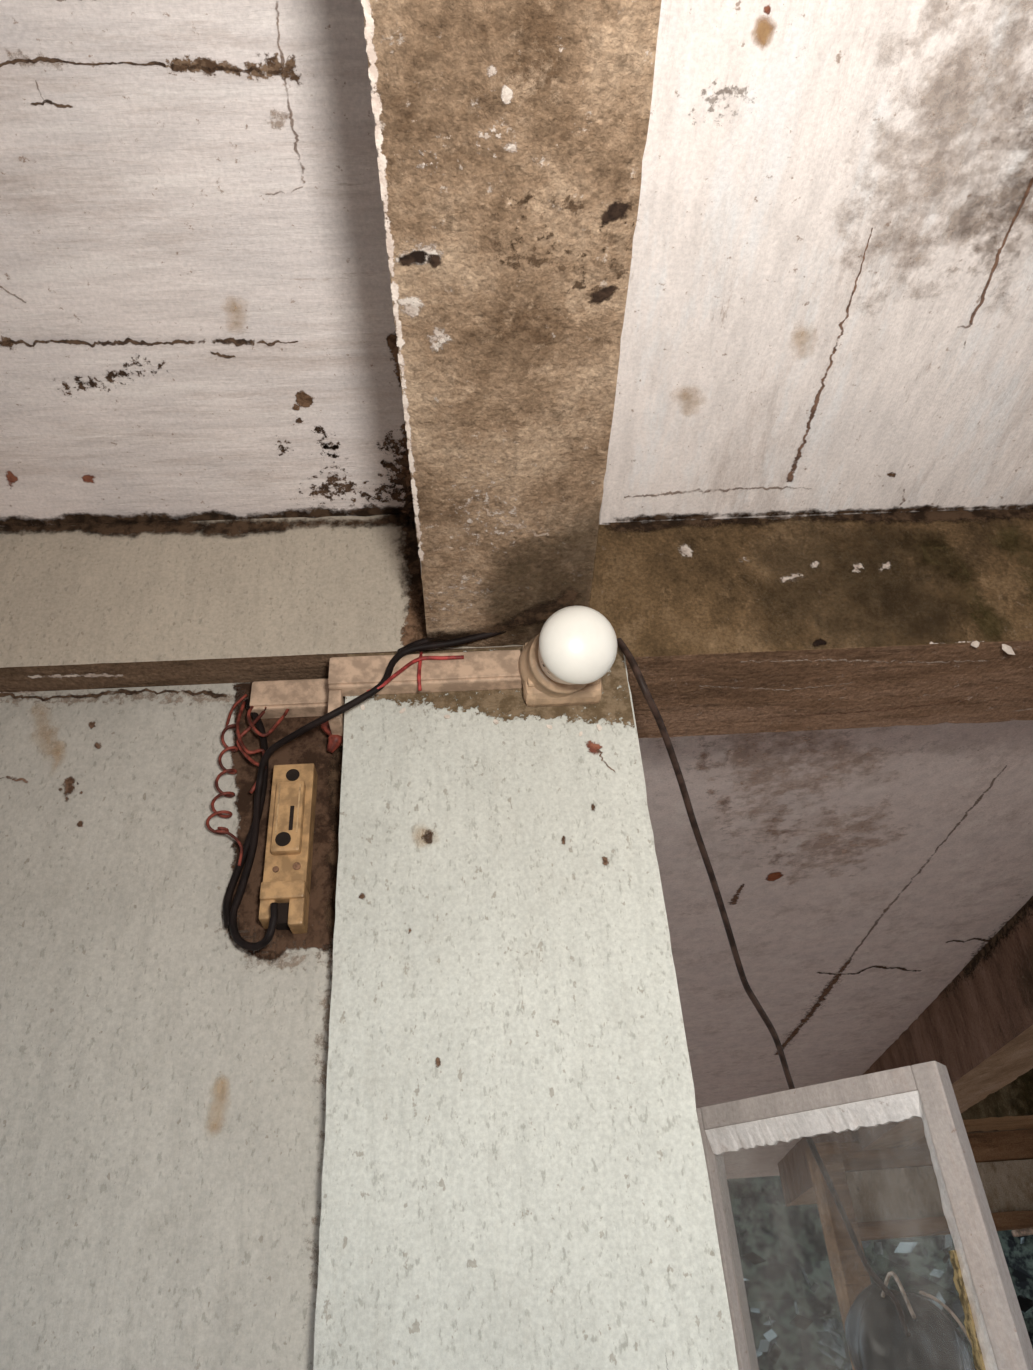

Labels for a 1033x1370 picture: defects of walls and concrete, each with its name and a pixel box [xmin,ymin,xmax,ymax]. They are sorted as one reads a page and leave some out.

crack [0,4,305,195]
damp [689,81,753,124]
crack [962,178,1033,345]
crack [0,336,298,359]
peeling [292,391,313,410]
crack [624,227,873,498]
crack [774,765,1007,1055]